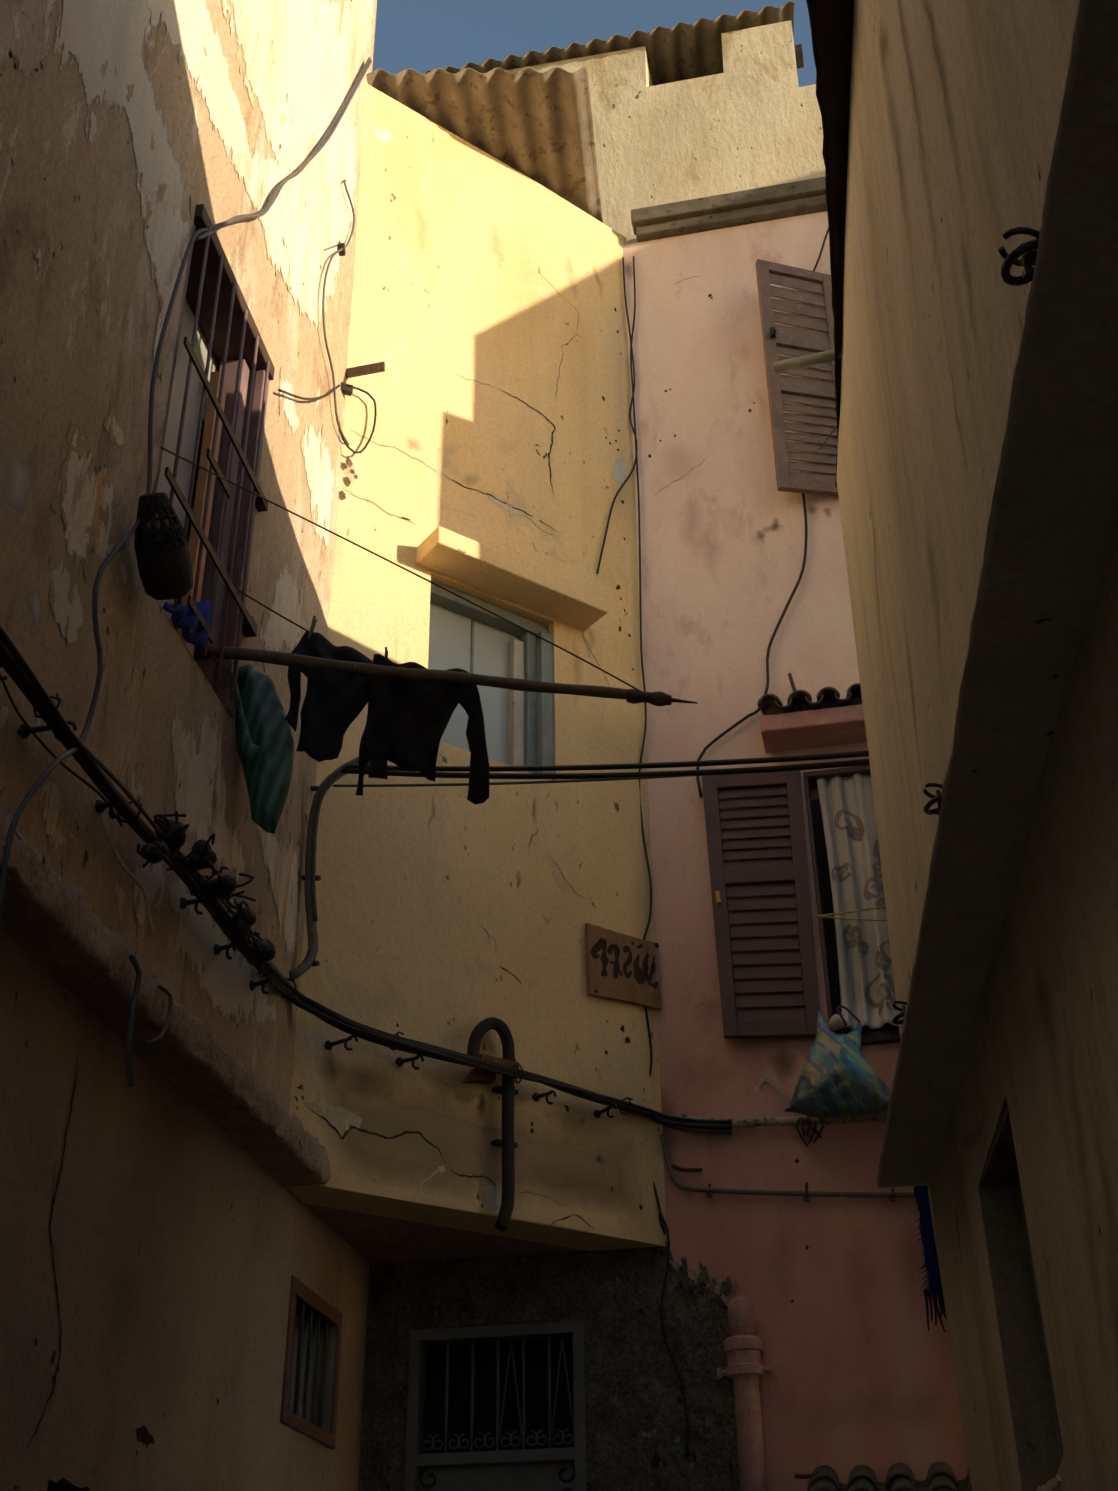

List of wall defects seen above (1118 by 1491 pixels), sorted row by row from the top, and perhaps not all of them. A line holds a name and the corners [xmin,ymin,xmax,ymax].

peeling [0,0,394,382]
crack [347,284,589,552]
crack [26,1051,79,1451]
crack [308,1107,595,1229]